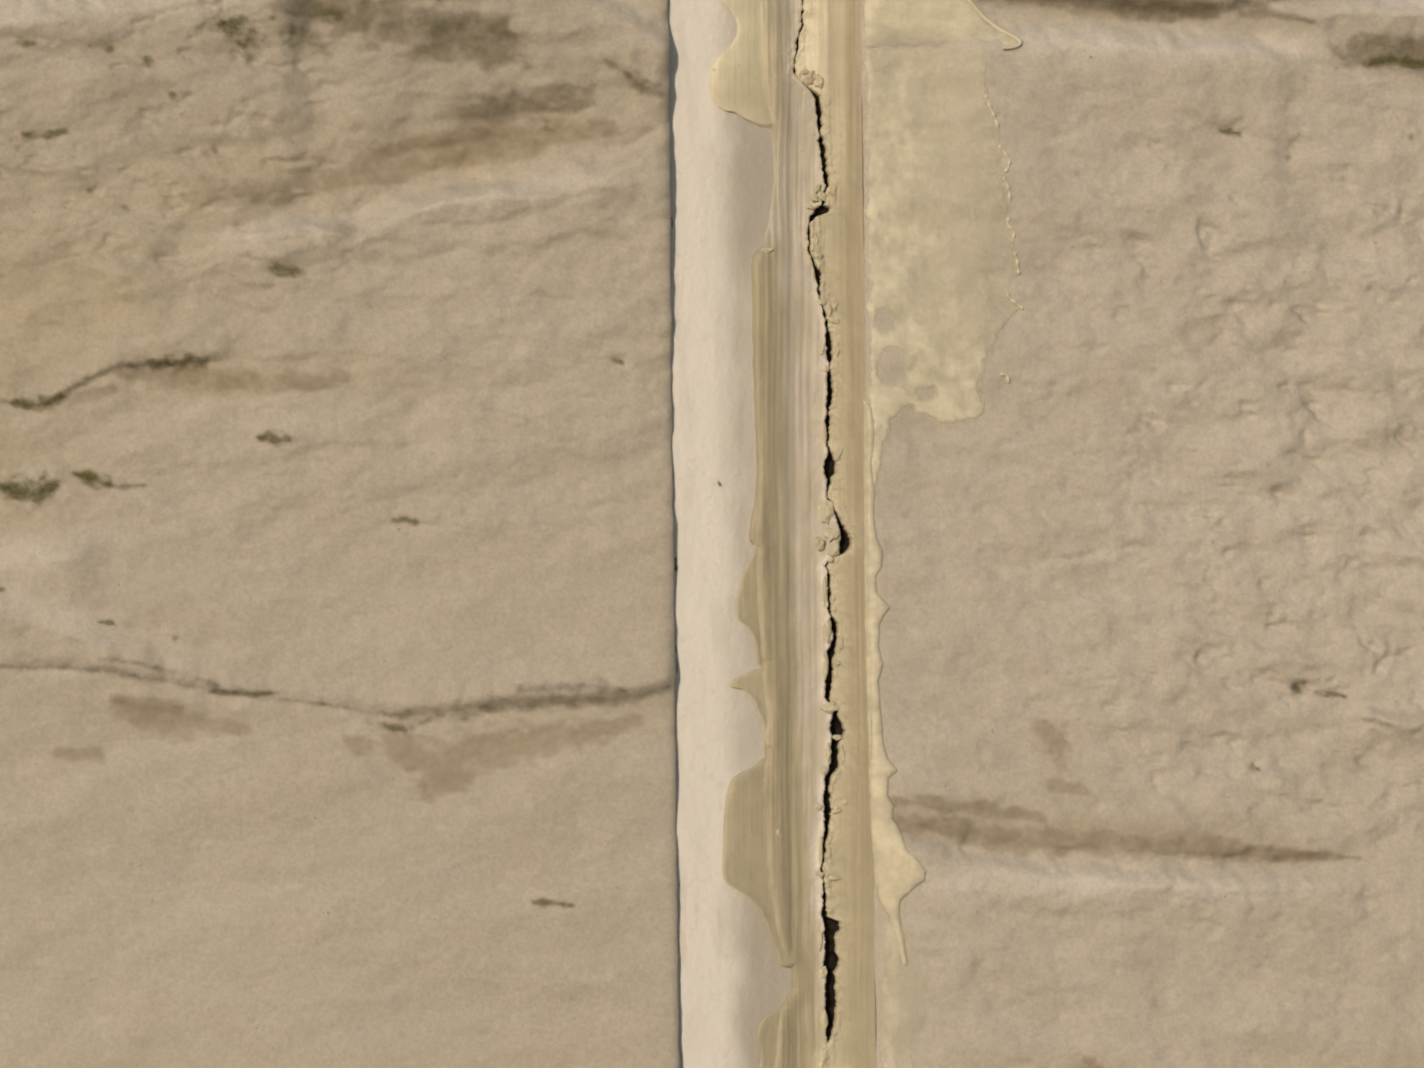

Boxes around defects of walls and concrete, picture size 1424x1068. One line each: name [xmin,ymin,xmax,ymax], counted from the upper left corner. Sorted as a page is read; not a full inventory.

crack [793,0,849,1041]